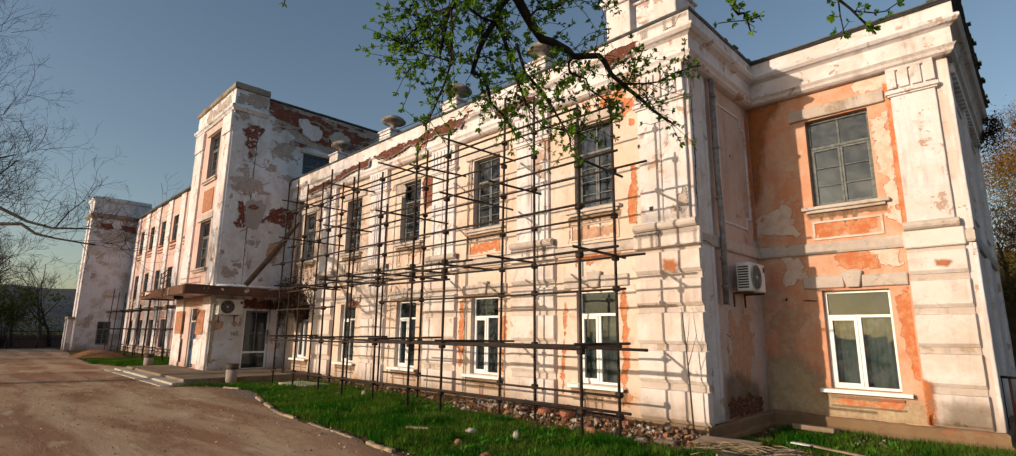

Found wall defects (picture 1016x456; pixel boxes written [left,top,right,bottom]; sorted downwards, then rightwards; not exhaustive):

flaking render [207,91,474,231]
peeling [627,165,654,225]
peeling [742,74,907,243]
peeling [220,240,286,291]
peeling [471,239,501,255]
peeling [573,221,617,241]
peeling [780,257,809,301]
peeling [833,249,905,271]
peeling [458,299,466,367]
peeling [619,290,631,404]
peeling [728,308,764,419]
peeling [895,285,921,381]